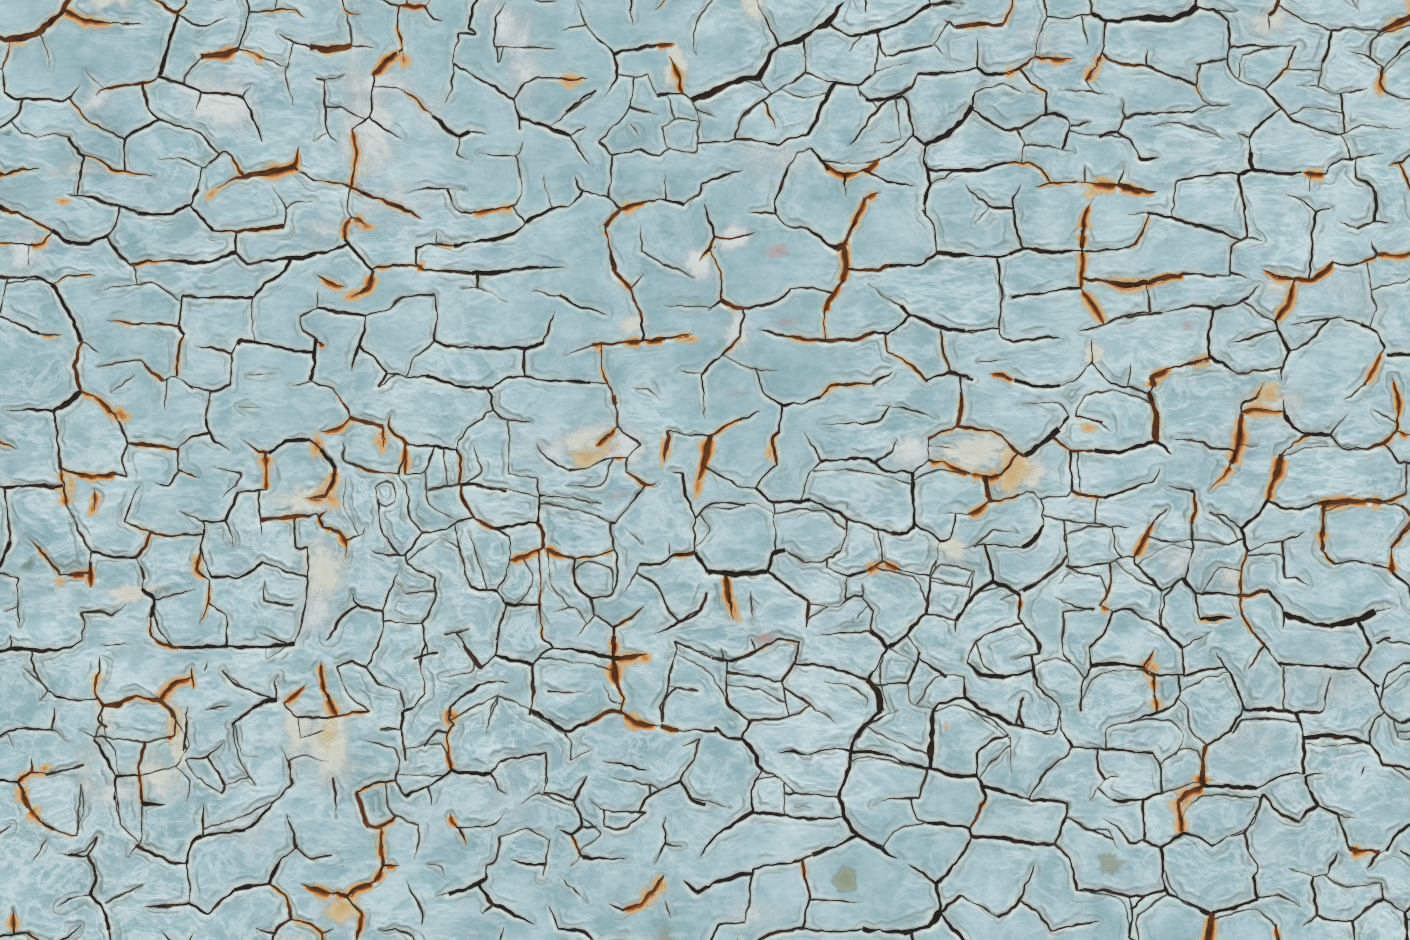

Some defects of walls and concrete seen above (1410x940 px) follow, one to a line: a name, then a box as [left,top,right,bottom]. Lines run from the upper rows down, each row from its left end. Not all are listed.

rust [63,6,113,28]
rust [259,150,301,181]
rust [205,180,236,201]
rust [821,159,880,312]
rust [1076,176,1184,324]
rust [1211,381,1283,489]
rust [692,438,716,499]
rust [1263,457,1289,501]
rust [604,640,653,685]
rust [303,829,397,938]
rust [1200,916,1218,940]